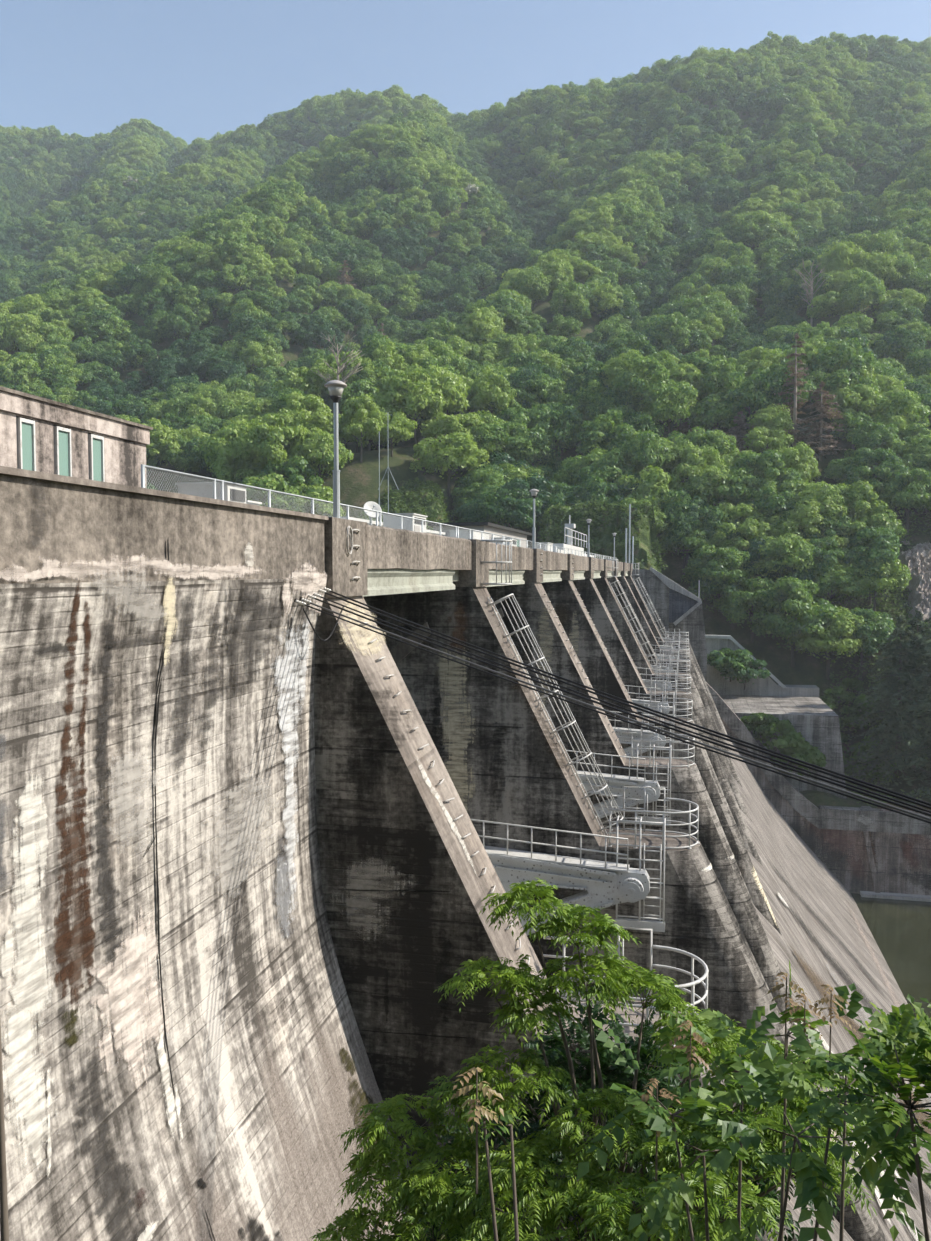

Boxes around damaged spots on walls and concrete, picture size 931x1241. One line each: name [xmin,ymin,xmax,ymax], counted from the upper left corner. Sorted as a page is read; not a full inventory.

damp [0,774,58,1175]
damp [35,643,69,656]
rust [53,586,95,1008]
crack [143,649,175,1099]
damp [71,576,310,1241]
damp [333,863,410,940]